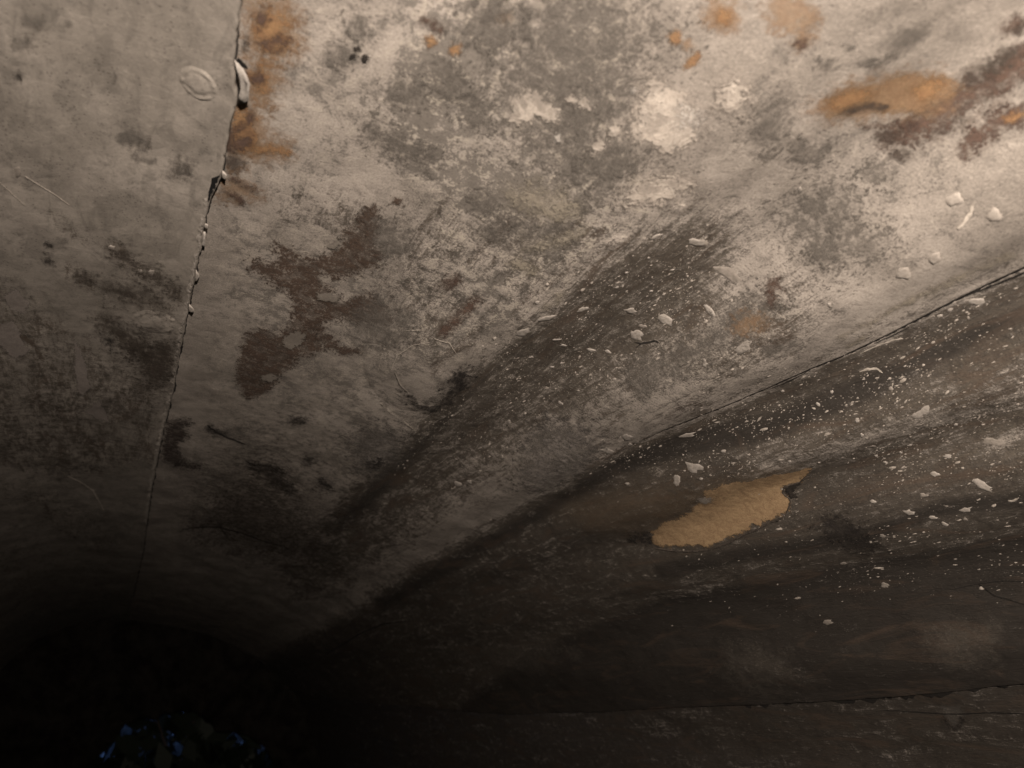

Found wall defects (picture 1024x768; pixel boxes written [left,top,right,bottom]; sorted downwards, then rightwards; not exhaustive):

water stain [317,8,372,78]
rust [219,0,304,207]
water stain [351,0,712,245]
rust [810,71,957,133]
rust [959,102,1024,161]
crack [133,0,243,597]
water stain [403,365,479,414]
crack [615,267,1024,454]
crack [207,425,263,466]
peeling [625,460,820,553]